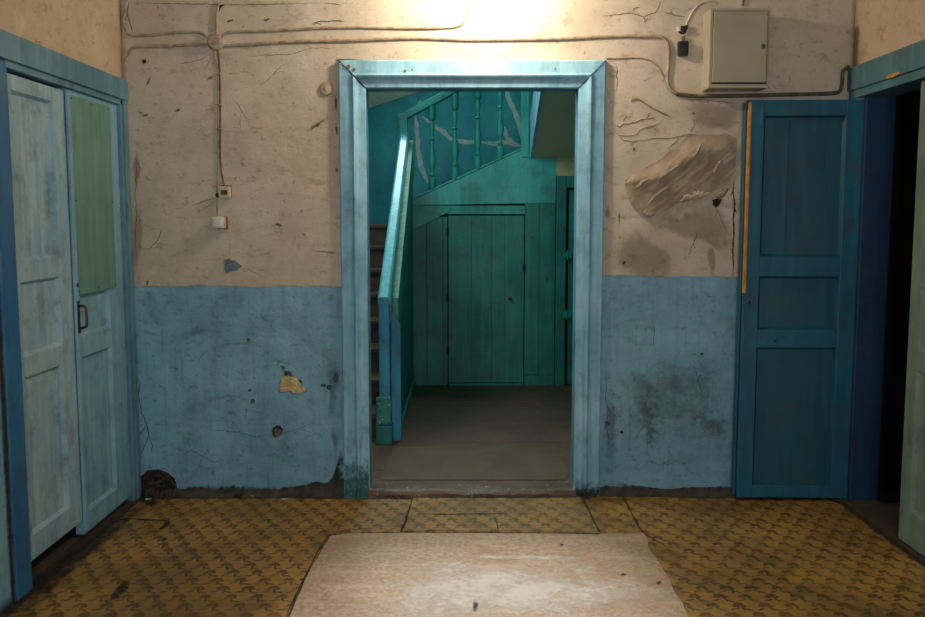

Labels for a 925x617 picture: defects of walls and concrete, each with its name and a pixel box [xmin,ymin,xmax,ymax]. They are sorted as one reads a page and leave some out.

crack [613,97,736,147]
crack [716,182,737,276]
peeling [223,257,243,274]
spalling [278,364,307,395]
peeling [271,425,284,438]
hole [141,468,183,499]